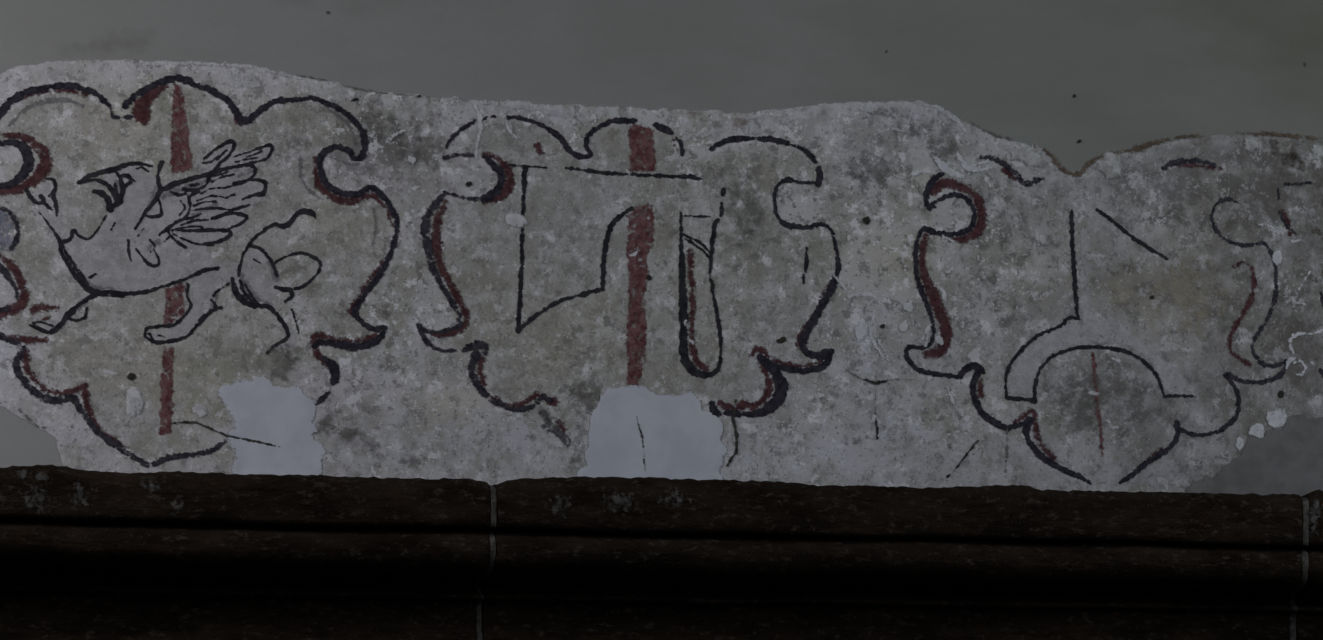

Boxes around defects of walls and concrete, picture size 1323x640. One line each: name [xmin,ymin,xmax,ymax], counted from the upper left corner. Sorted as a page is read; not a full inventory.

flaking render [0,59,1323,493]